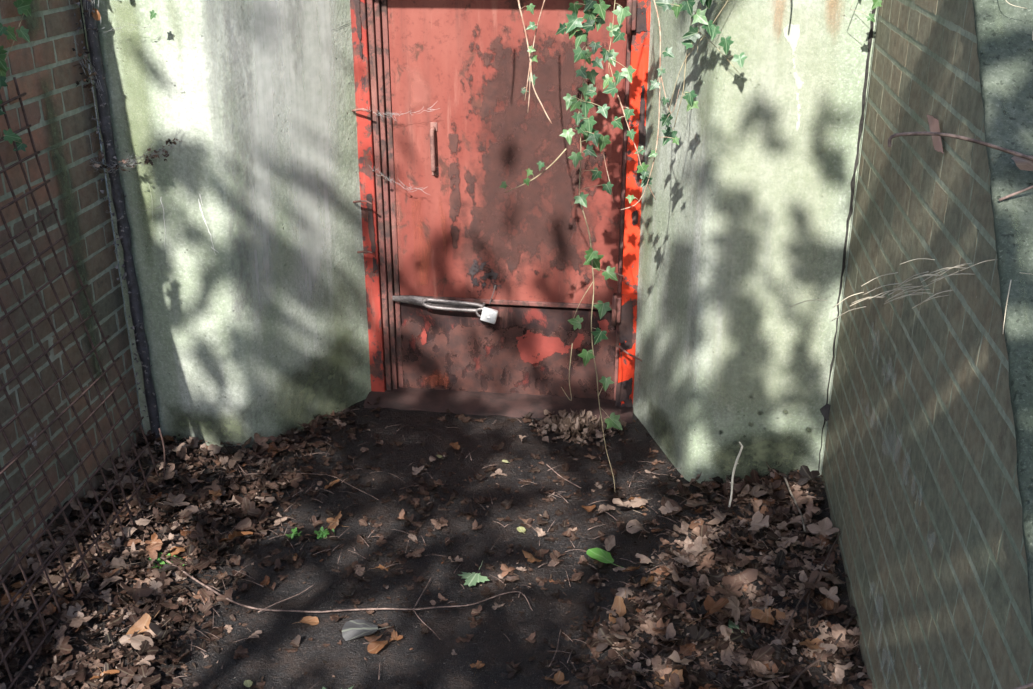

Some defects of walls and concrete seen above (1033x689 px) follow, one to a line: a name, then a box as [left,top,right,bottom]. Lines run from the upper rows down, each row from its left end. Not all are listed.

damp [784,24,804,130]
corrosion [448,26,610,289]
corrosion [396,318,616,400]
peeling [516,330,585,364]
peeling [598,301,634,352]
peeling [615,378,633,408]